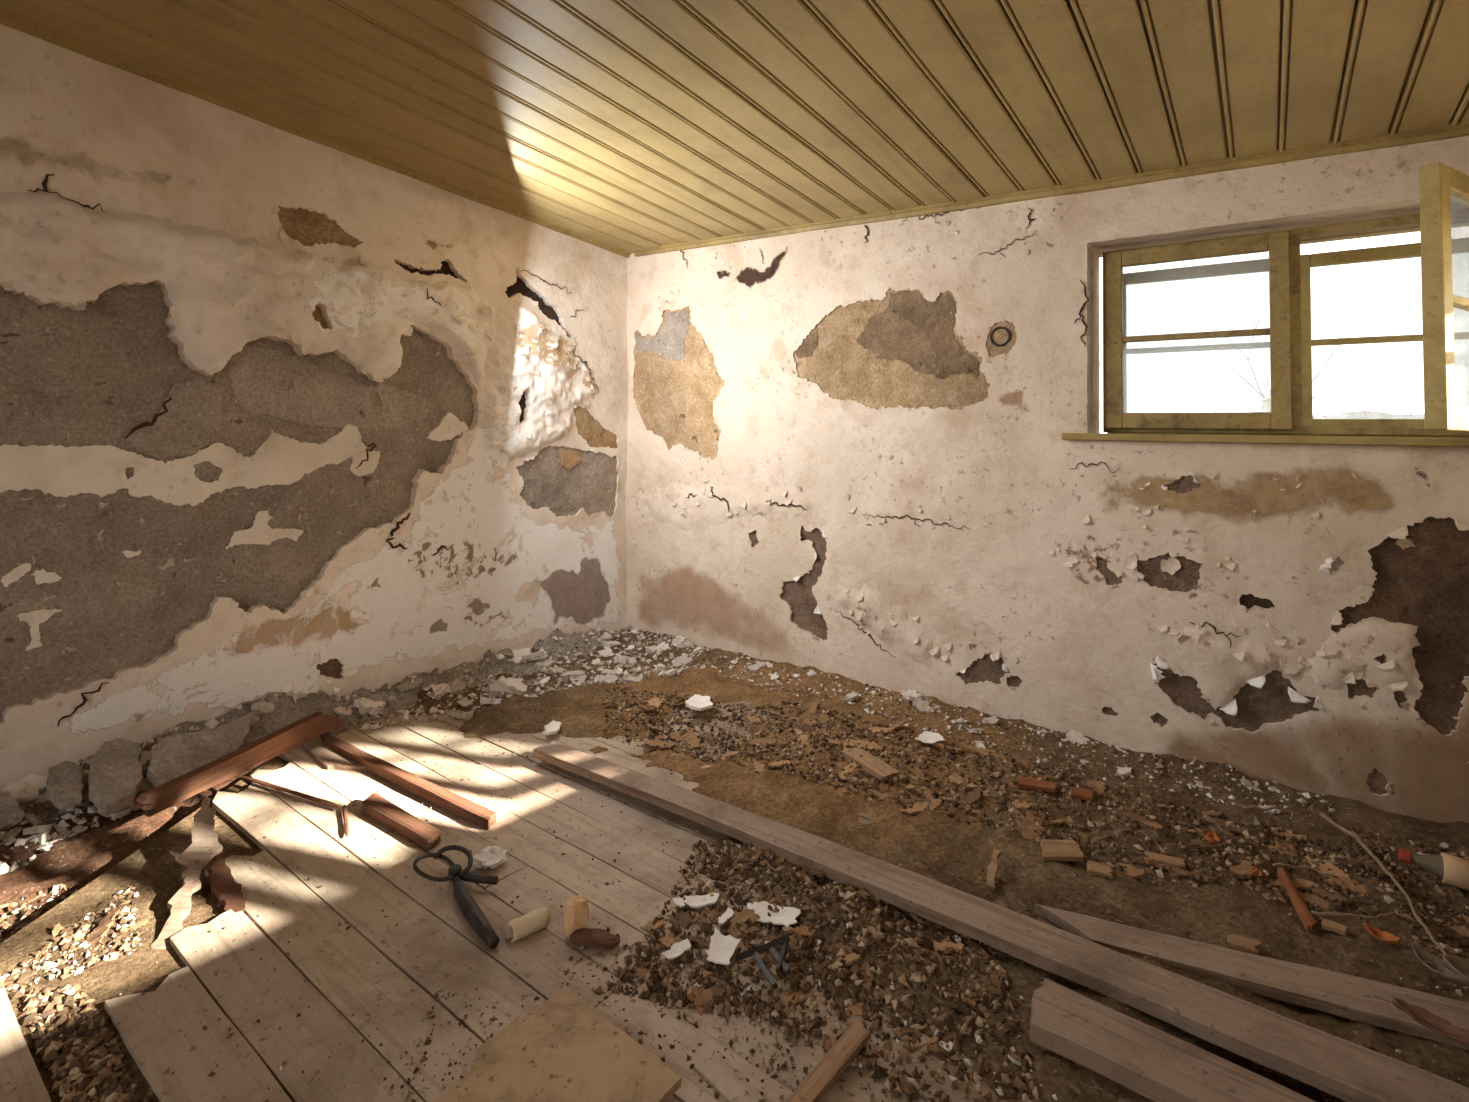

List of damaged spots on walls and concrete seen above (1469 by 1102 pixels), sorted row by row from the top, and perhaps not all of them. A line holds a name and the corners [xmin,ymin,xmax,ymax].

flaking render [0,279,591,723]
crack [505,267,599,393]
flaking render [498,385,620,517]
flaking render [633,307,725,518]
crack [741,247,787,284]
flaking render [794,288,1017,411]
flaking render [781,526,828,641]
flaking render [1150,516,1469,734]